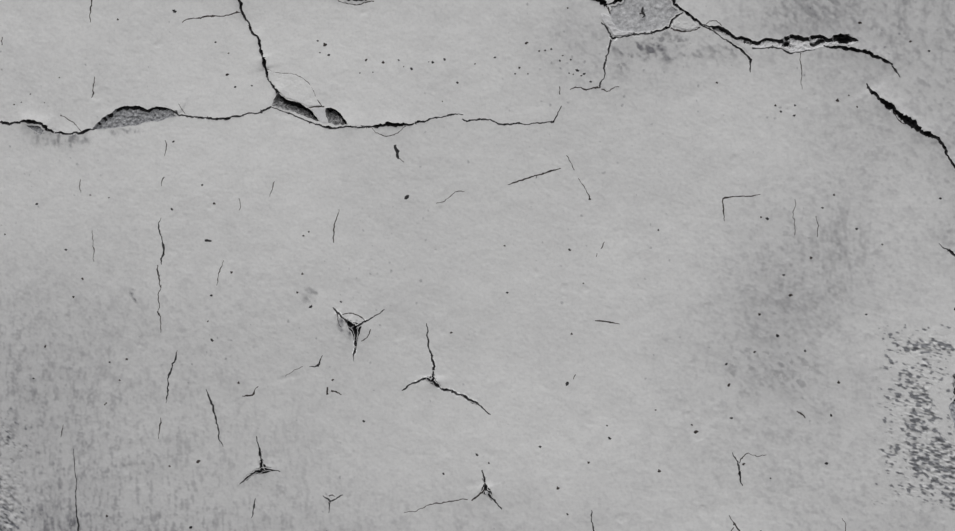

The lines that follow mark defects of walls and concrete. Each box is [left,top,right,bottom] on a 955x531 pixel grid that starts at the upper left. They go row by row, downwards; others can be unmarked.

spalling [601,0,860,53]
crack [174,0,900,137]
crack [0,115,97,136]
spalling [91,105,177,130]
crack [866,83,955,169]
crack [156,219,165,333]
crack [333,308,385,361]
crack [402,323,491,415]
crack [206,389,223,445]
peeling [0,407,65,531]
crack [240,436,280,518]
crack [404,470,502,513]